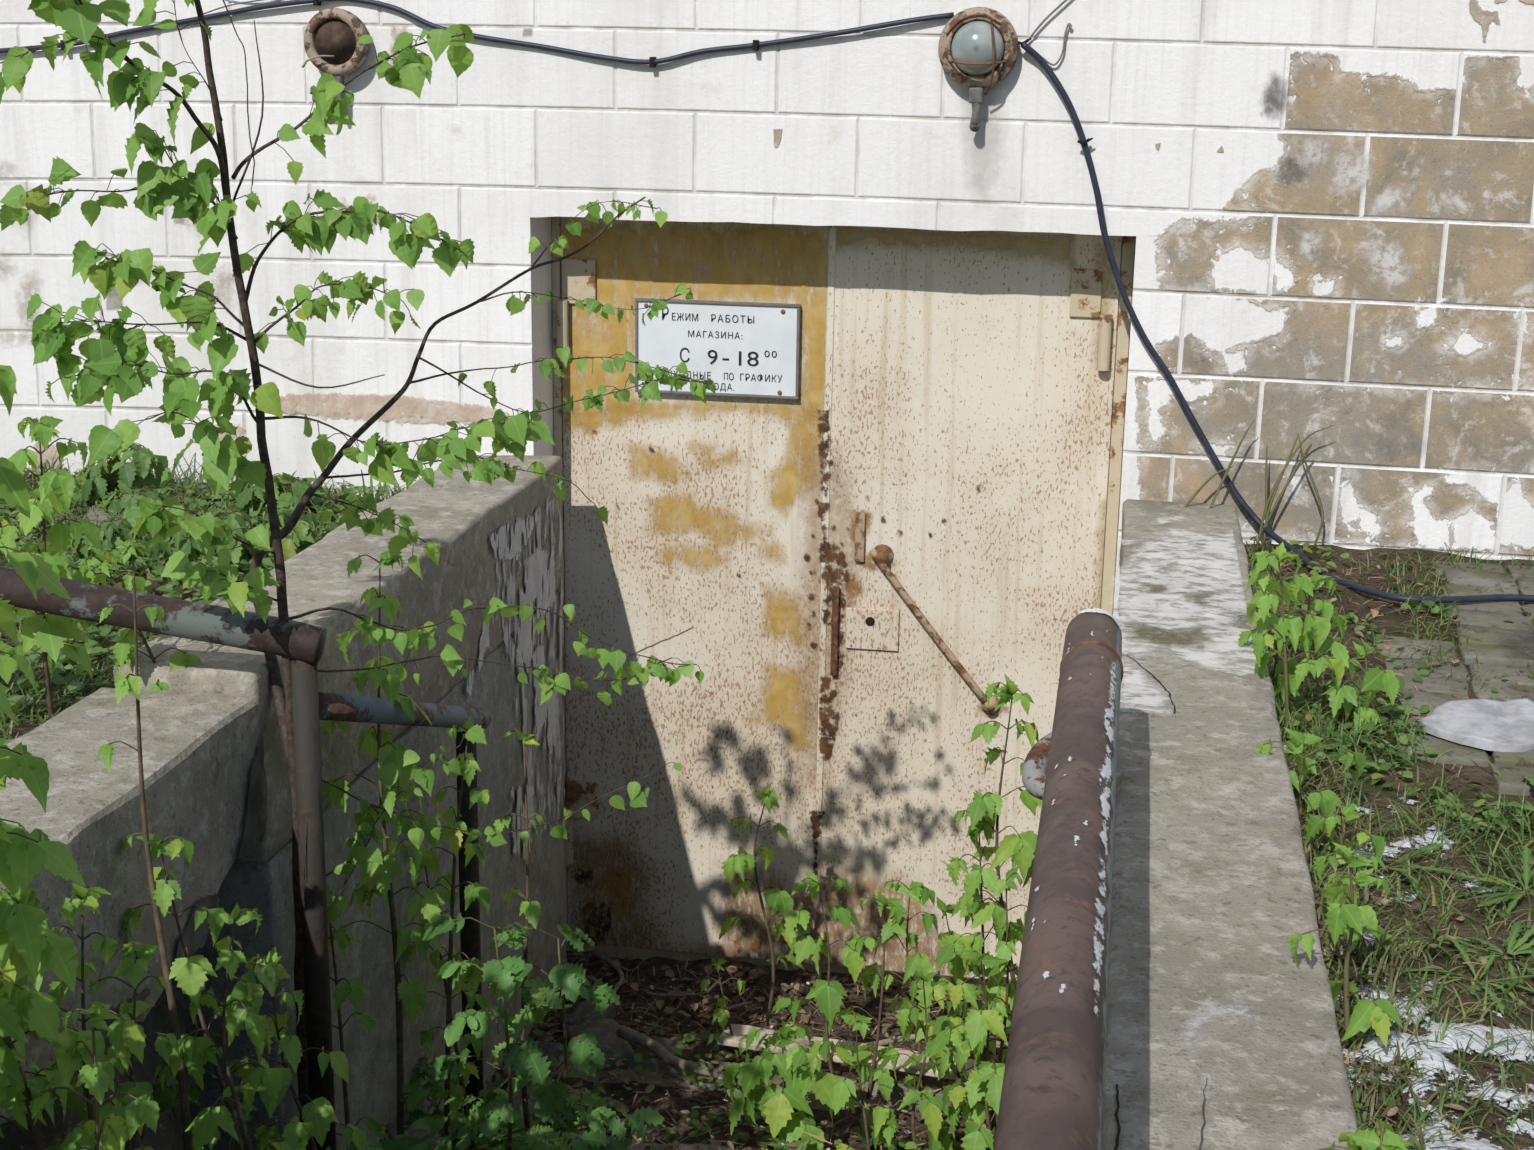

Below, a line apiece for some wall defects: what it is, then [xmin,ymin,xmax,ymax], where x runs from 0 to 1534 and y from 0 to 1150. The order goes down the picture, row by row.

peeling [562,223,1070,509]
peeling [630,449,754,568]
peeling [1074,0,1534,1016]
peeling [767,593,801,641]
corrosion [804,410,902,760]
peeling [467,497,567,860]
peeling [757,670,809,748]
crack [1113,1084,1121,1150]
crack [1199,1078,1207,1150]